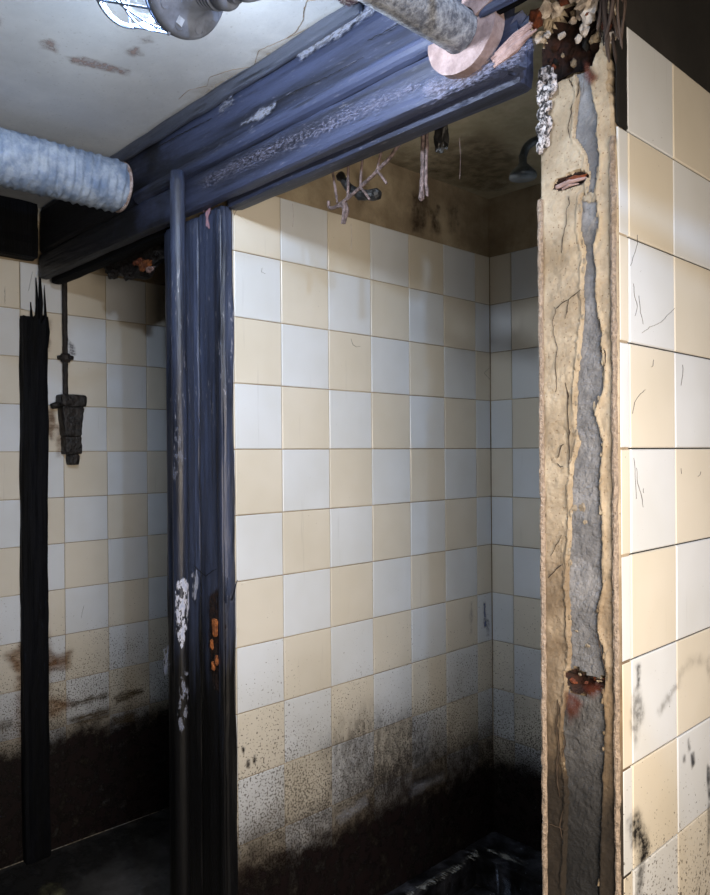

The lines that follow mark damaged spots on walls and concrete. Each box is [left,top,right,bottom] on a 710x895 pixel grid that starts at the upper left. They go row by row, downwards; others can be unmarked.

spalling [202,0,628,186]
crack [630,235,675,333]
crack [552,289,581,467]
spalling [536,52,606,895]
peeling [175,569,198,649]
leakage [72,689,143,707]
leakage [0,708,170,895]
leakage [238,742,542,895]
leakage [631,814,649,887]